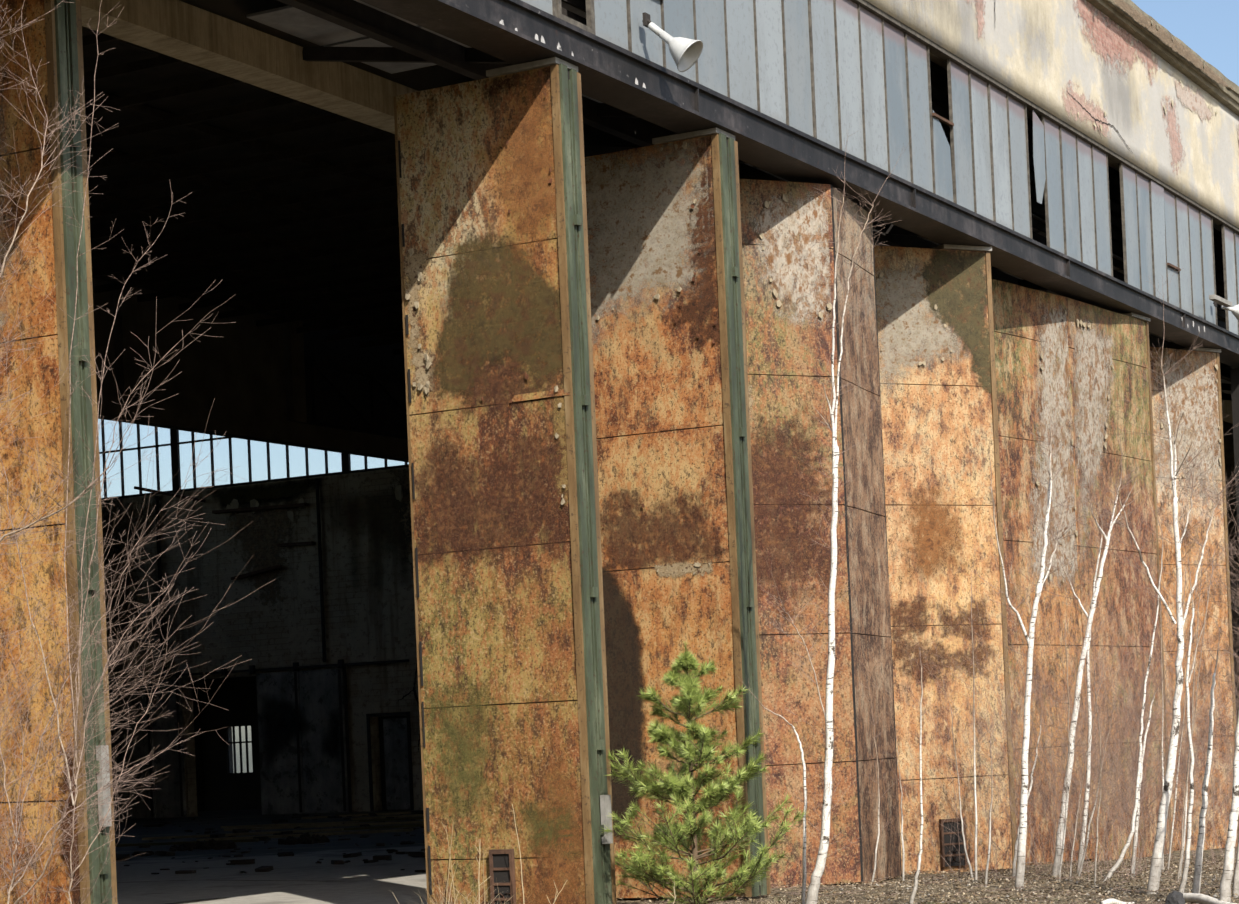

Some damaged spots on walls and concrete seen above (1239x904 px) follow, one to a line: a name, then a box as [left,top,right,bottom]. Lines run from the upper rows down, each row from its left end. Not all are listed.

spalling [967,0,985,37]
spalling [1073,0,1234,90]
spalling [1063,80,1109,136]
flaking render [1161,74,1217,174]
corrosion [672,136,720,349]
water stain [433,234,563,396]
water stain [923,250,991,393]
corrosion [601,490,724,569]
corrosion [751,420,832,615]
corrosion [907,489,960,576]
corrosion [891,597,991,681]